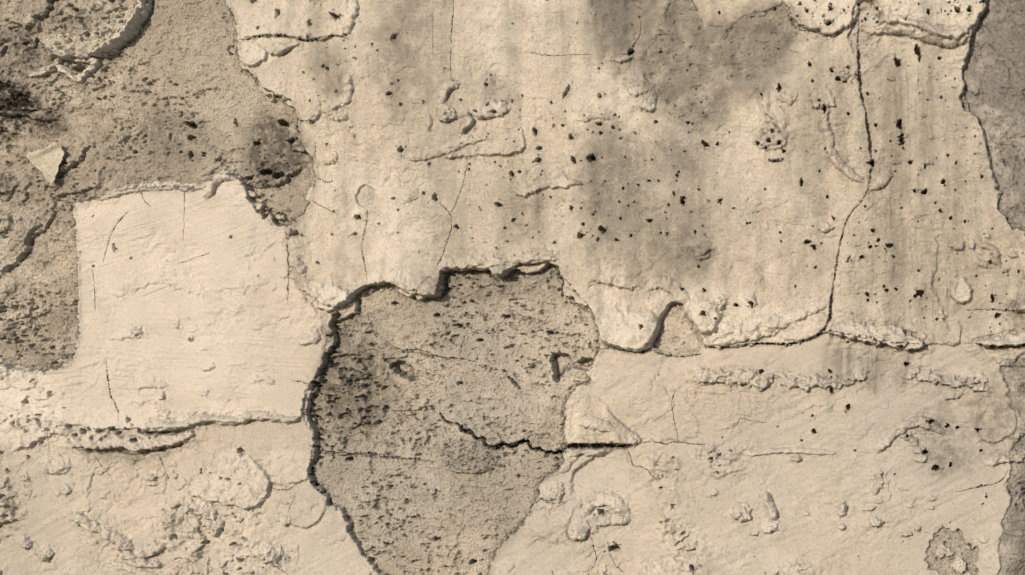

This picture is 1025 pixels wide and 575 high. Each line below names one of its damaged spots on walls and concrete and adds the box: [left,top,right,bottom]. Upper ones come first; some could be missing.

spalling [0,0,1025,372]
crack [601,0,873,358]
spalling [287,259,602,575]
crack [442,393,705,478]
spalling [572,446,635,513]
spalling [925,527,979,575]
spalling [998,345,1025,575]